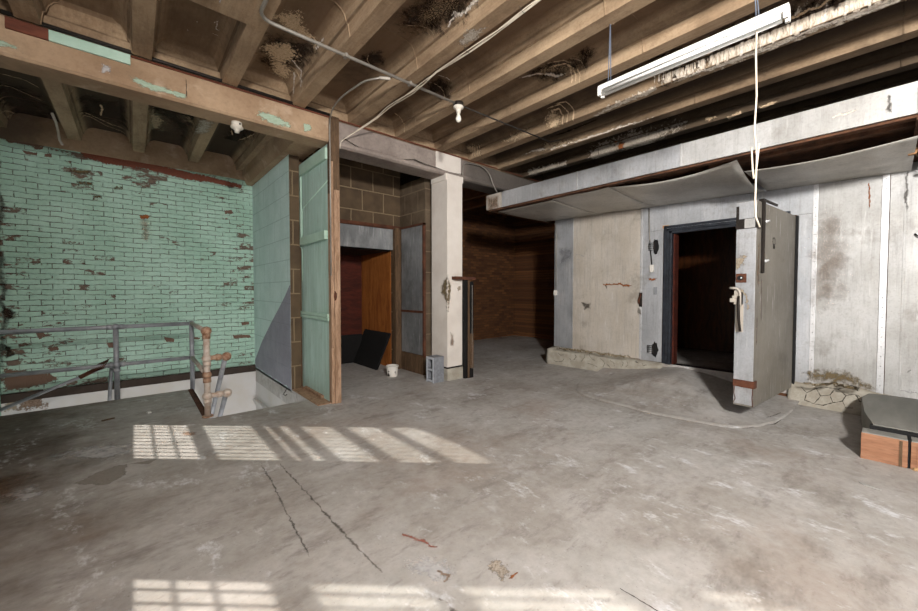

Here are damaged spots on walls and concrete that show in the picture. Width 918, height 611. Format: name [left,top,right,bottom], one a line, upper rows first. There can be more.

damp [403,0,478,36]
damp [259,9,324,93]
damp [522,0,902,154]
peeling [6,140,52,157]
peeling [80,152,242,189]
peeling [1,368,58,412]